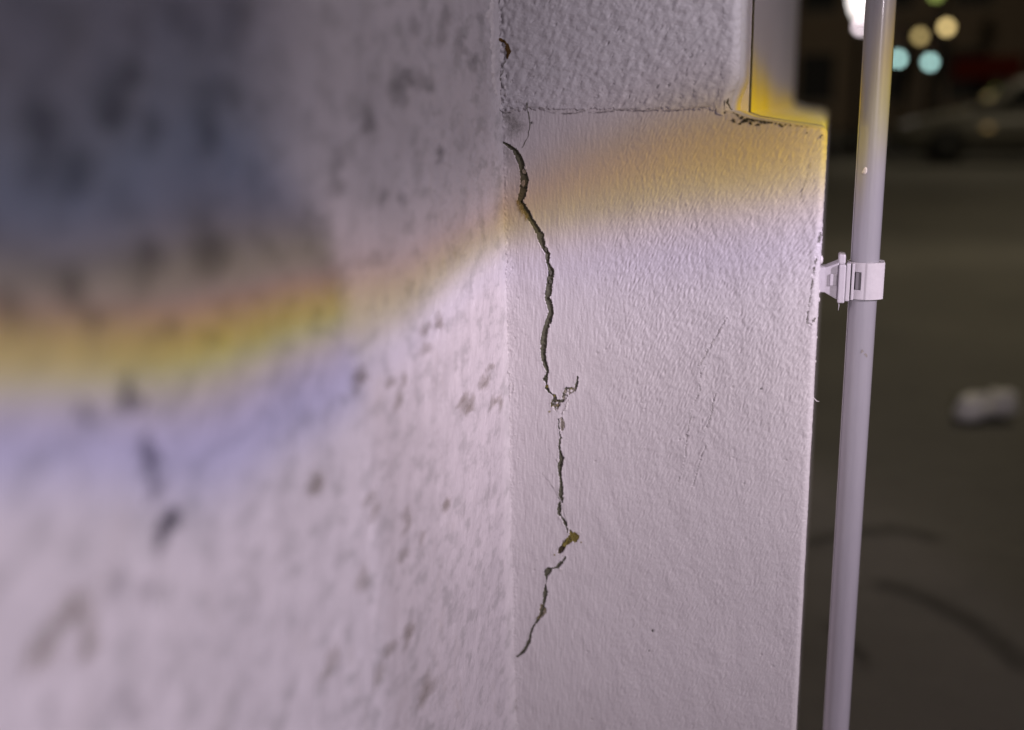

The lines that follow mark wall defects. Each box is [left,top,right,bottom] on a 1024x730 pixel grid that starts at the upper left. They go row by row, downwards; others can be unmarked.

crack [503,98,750,657]